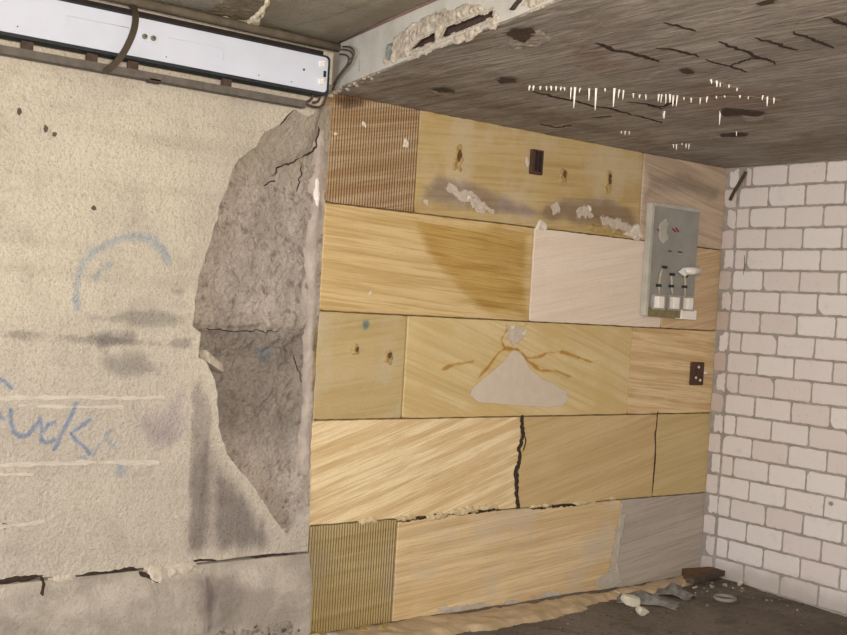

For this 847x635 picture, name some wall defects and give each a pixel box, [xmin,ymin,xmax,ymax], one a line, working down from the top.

spalling [509,0,554,13]
spalling [506,28,552,50]
crack [595,31,834,72]
damp [527,79,778,118]
spalling [585,224,643,240]
spalling [193,0,501,529]
crack [513,415,527,509]
crack [651,412,659,492]
spalling [529,501,596,510]
crack [250,551,293,559]
crack [0,575,46,596]
crack [76,567,158,583]